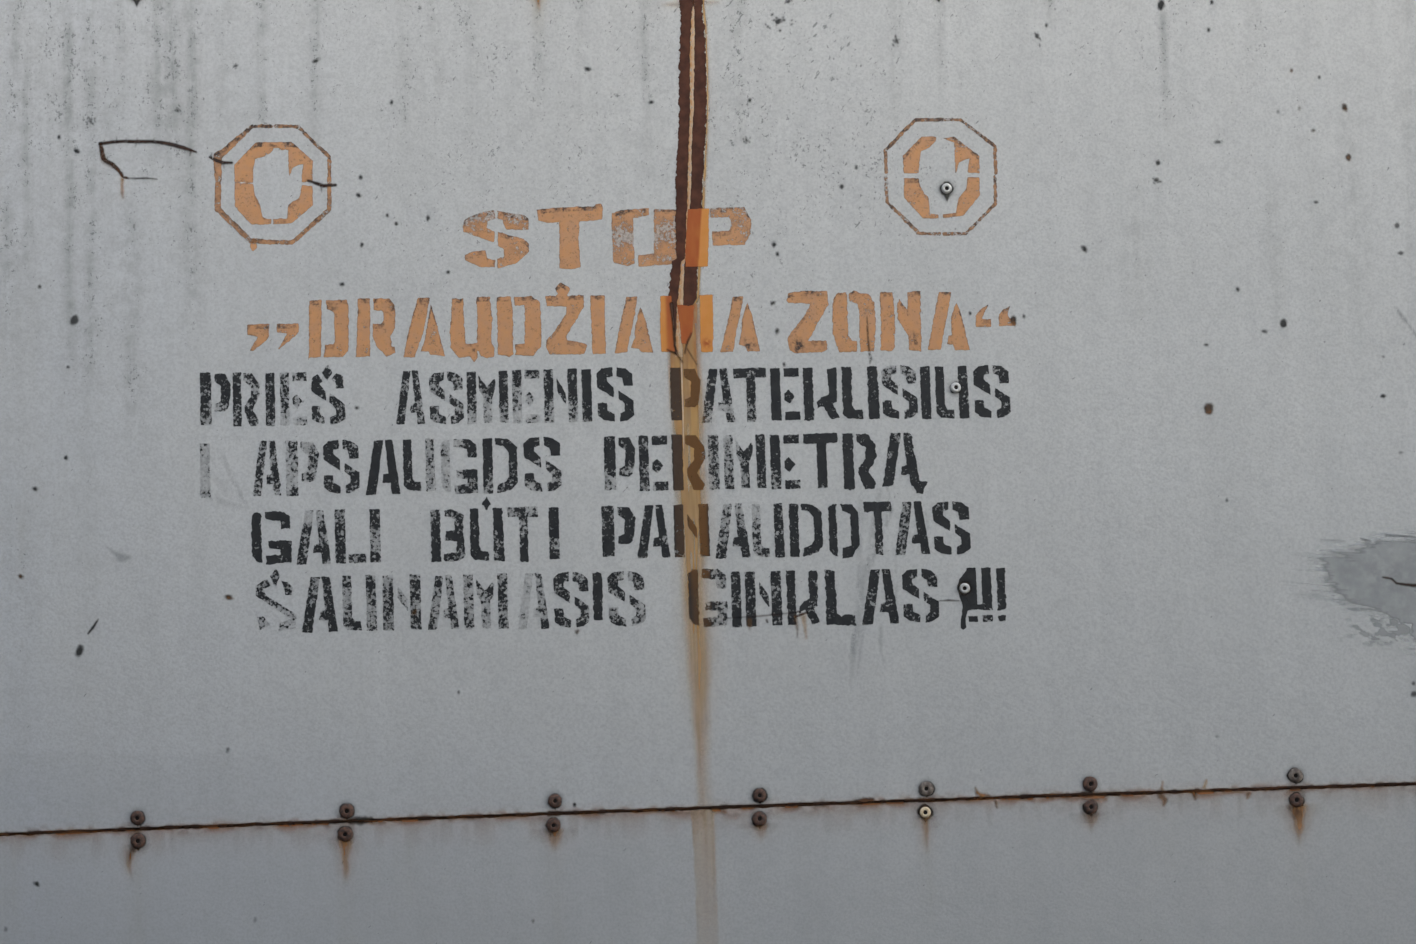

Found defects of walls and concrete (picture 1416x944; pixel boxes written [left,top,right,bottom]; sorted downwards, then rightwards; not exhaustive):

crack [98,140,233,181]
crack [307,179,337,187]
rust [667,267,701,594]
peeling [1322,539,1416,640]
rust [0,782,1416,863]